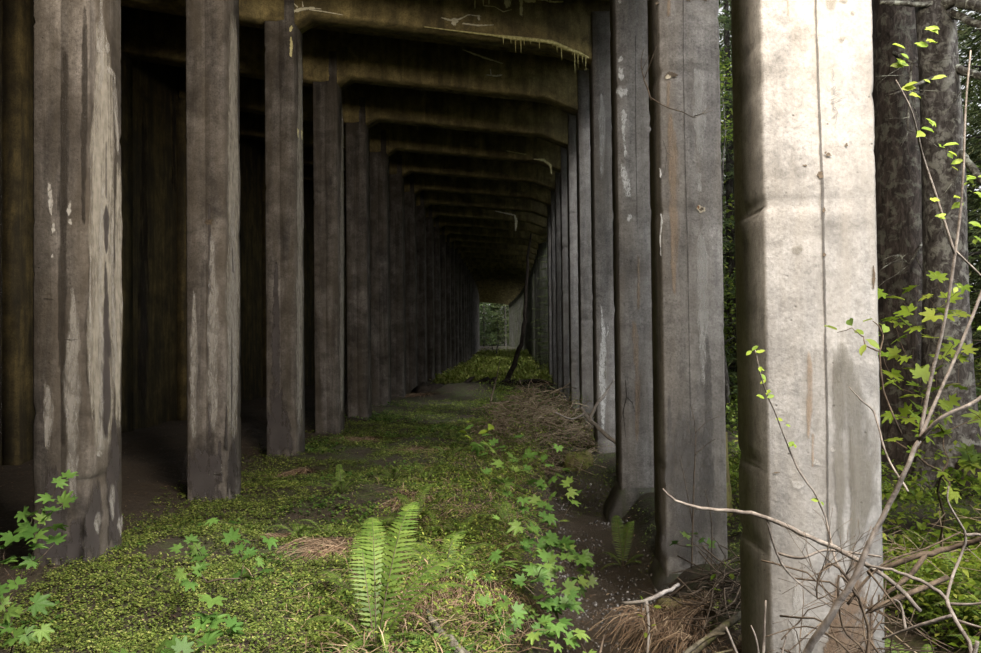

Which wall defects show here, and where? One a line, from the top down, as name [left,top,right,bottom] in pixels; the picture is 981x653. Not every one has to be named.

leakage [424,14,589,68]
leakage [616,56,631,197]
leakage [832,352,872,568]